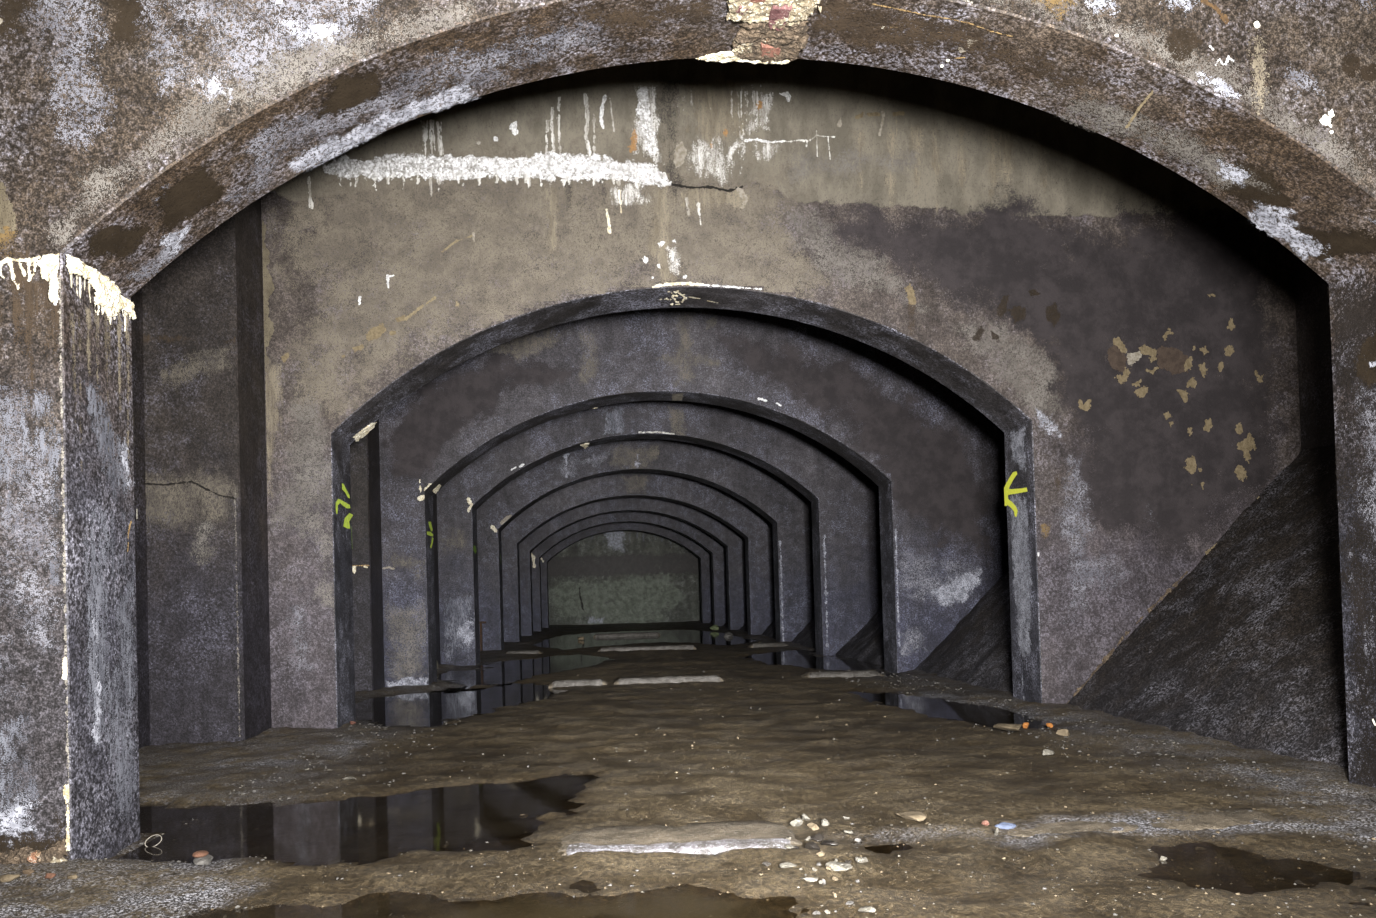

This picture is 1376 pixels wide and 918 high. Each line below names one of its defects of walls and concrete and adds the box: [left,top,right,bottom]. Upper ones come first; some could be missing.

spalling [673,0,822,187]
water stain [66,254,138,827]
water stain [0,0,1376,687]
peeling [1107,318,1235,403]
peeling [1163,411,1213,436]
peeling [1185,455,1204,490]
peeling [1234,422,1257,482]
water stain [1327,270,1376,788]